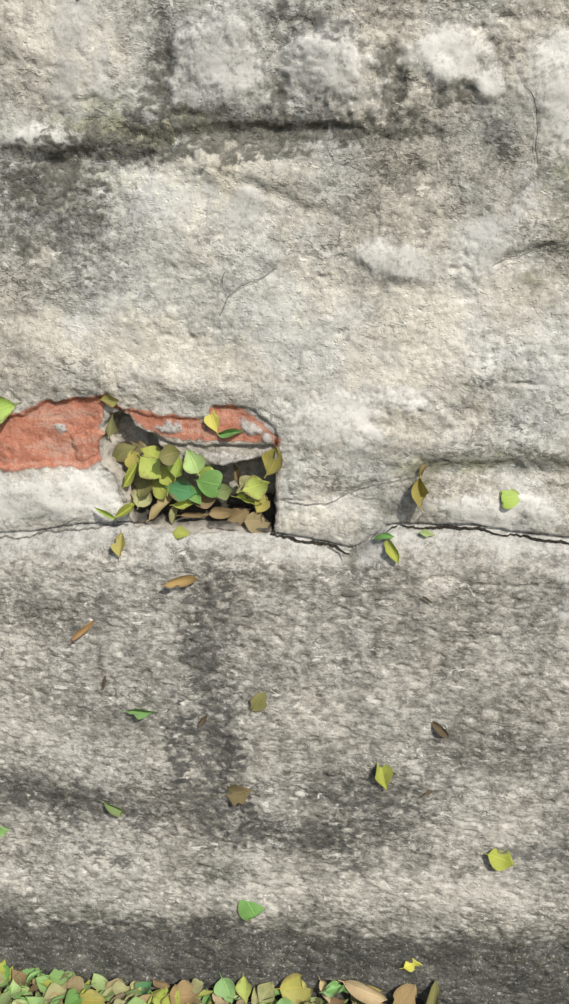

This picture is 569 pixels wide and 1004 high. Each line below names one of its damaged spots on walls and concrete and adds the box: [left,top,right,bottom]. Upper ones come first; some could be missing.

spalling [0,371,431,534]
crack [0,519,128,539]
crack [270,459,454,559]
crack [387,510,569,544]
leakage [0,905,569,1004]